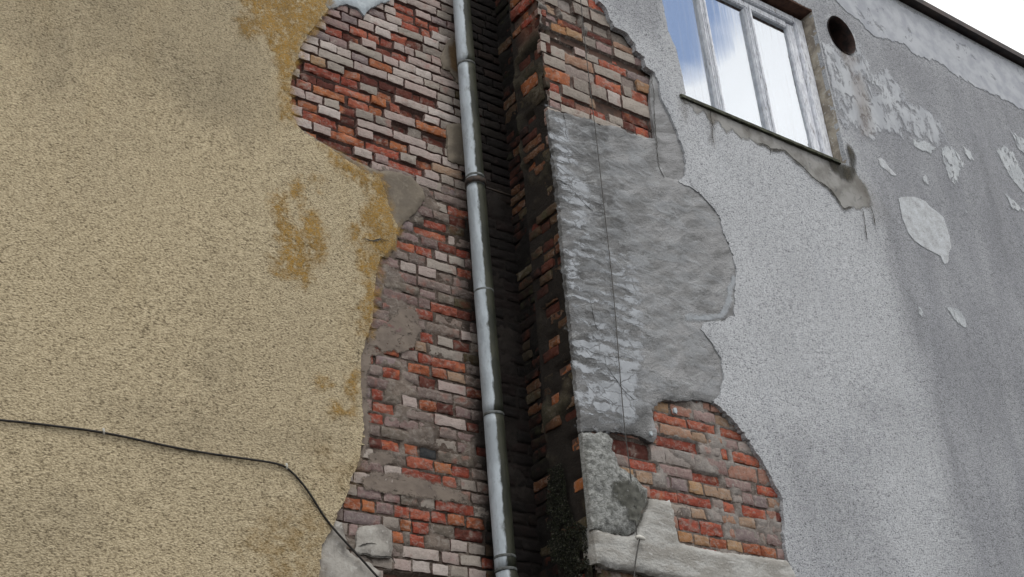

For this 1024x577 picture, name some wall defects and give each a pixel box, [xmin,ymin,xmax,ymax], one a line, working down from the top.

peeling [836,0,1024,110]
peeling [822,42,975,183]
peeling [997,133,1024,212]
water stain [273,180,327,287]
flaking render [289,0,496,577]
flaking render [470,0,542,577]
flaking render [534,0,785,560]
peeling [899,197,951,264]
peeling [947,306,968,328]
flaking render [595,565,644,577]